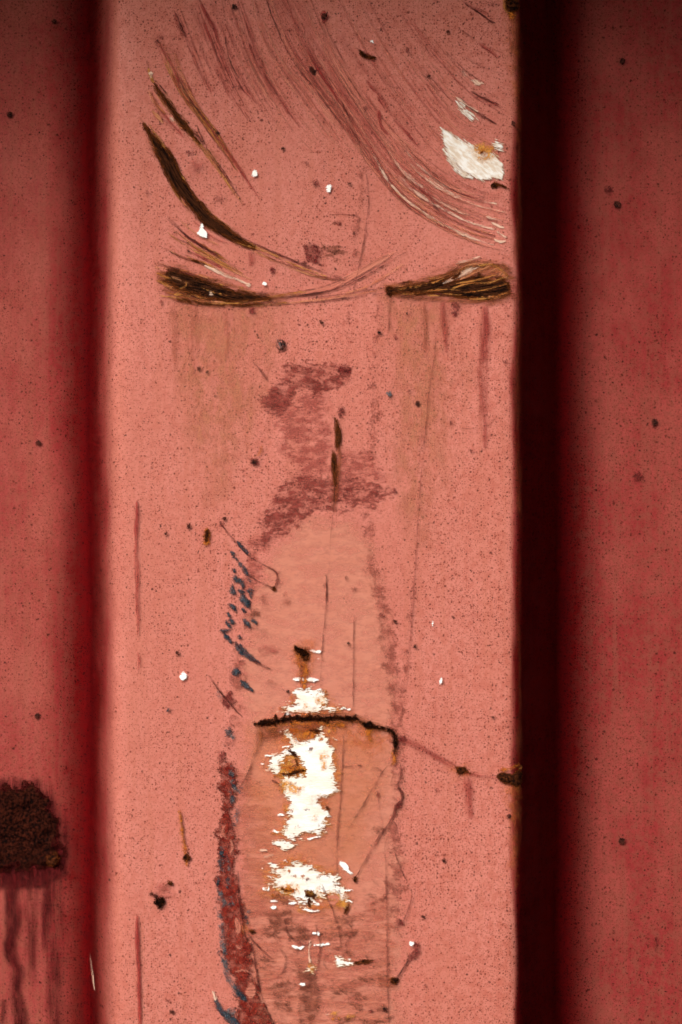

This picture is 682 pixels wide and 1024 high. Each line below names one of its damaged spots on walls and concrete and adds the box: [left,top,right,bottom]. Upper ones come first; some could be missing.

spalling [142,66,515,308]
rust [0,780,68,1024]
rust [293,644,310,690]
peeling [211,677,393,1024]
rust [497,764,523,787]